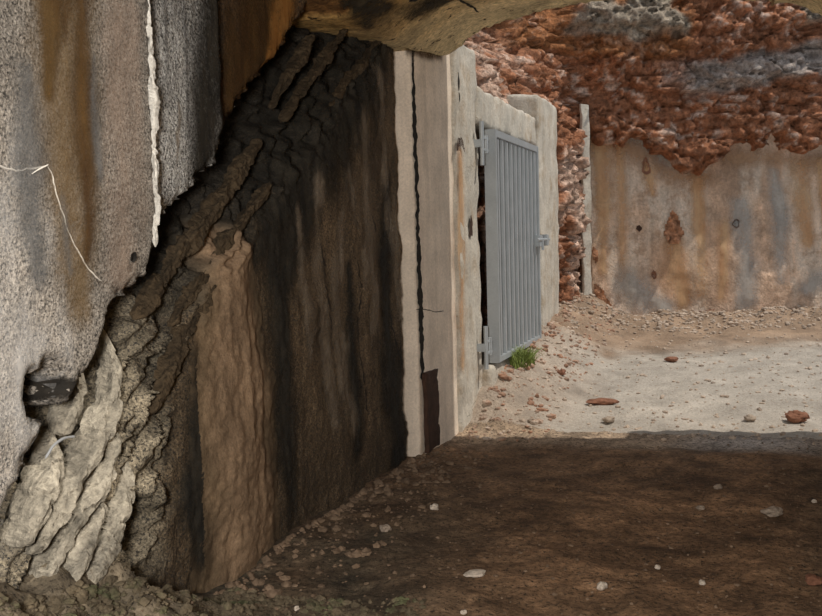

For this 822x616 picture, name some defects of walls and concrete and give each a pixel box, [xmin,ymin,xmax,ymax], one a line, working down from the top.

crack [0,164,101,281]
corrosion [40,0,94,315]
spalling [129,0,272,416]
spalling [268,29,349,123]
spalling [0,329,135,584]